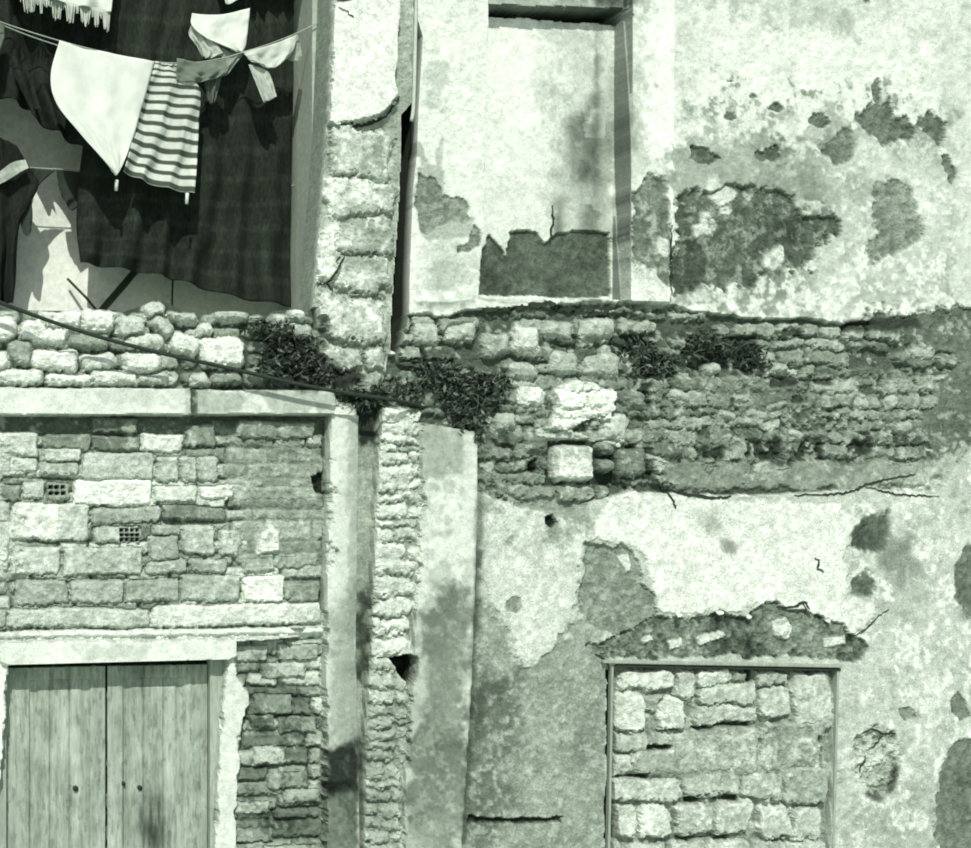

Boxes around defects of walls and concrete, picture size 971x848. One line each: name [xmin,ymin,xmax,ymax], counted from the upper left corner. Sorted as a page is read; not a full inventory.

spalling [808,79,957,185]
crack [548,205,556,240]
spalling [414,173,842,303]
spalling [865,177,925,266]
crack [652,477,732,509]
crack [794,474,939,497]
spalling [578,541,870,664]